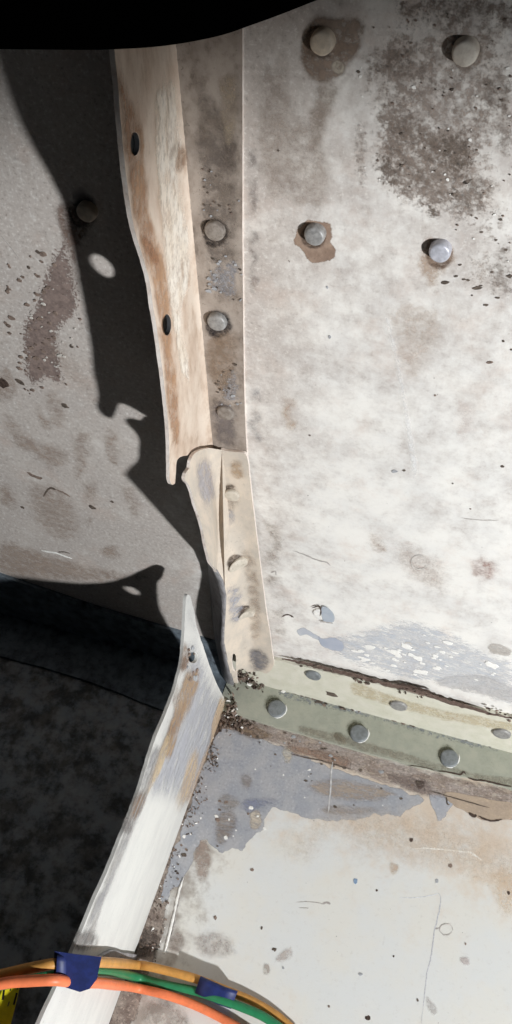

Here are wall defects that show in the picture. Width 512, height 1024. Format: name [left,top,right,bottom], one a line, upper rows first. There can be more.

peeling [160,729,512,951]